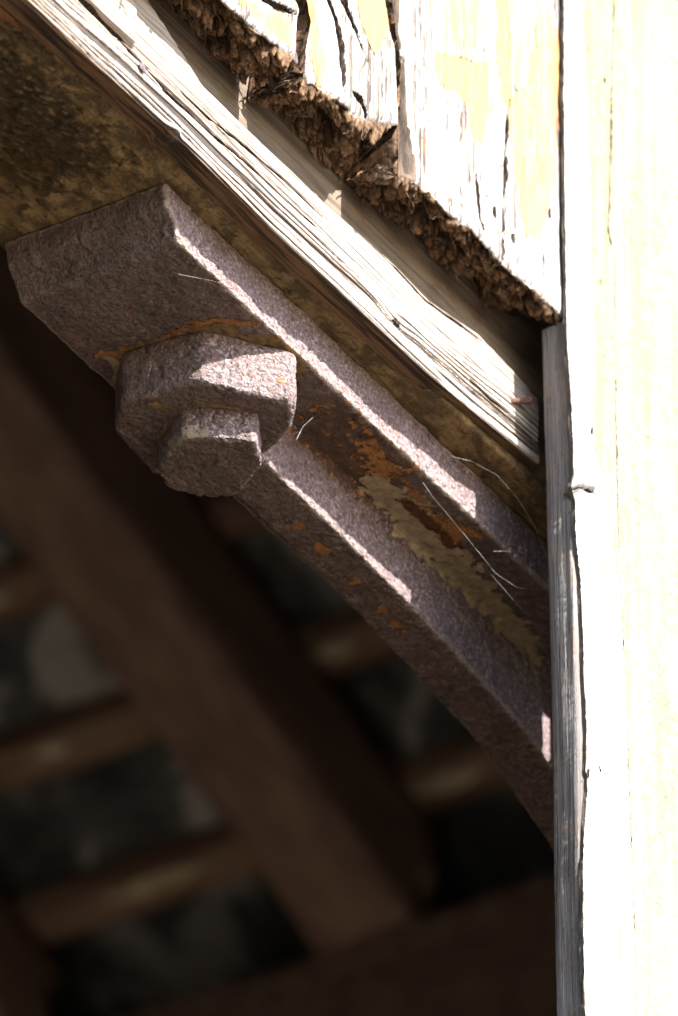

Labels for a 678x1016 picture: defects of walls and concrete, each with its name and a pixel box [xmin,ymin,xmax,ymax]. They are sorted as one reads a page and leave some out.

crack [78,0,314,226]
peeling [240,0,327,89]
crack [326,0,369,121]
peeling [358,0,389,55]
corrosion [94,318,308,393]
corrosion [288,391,544,688]
peeling [432,0,636,1016]